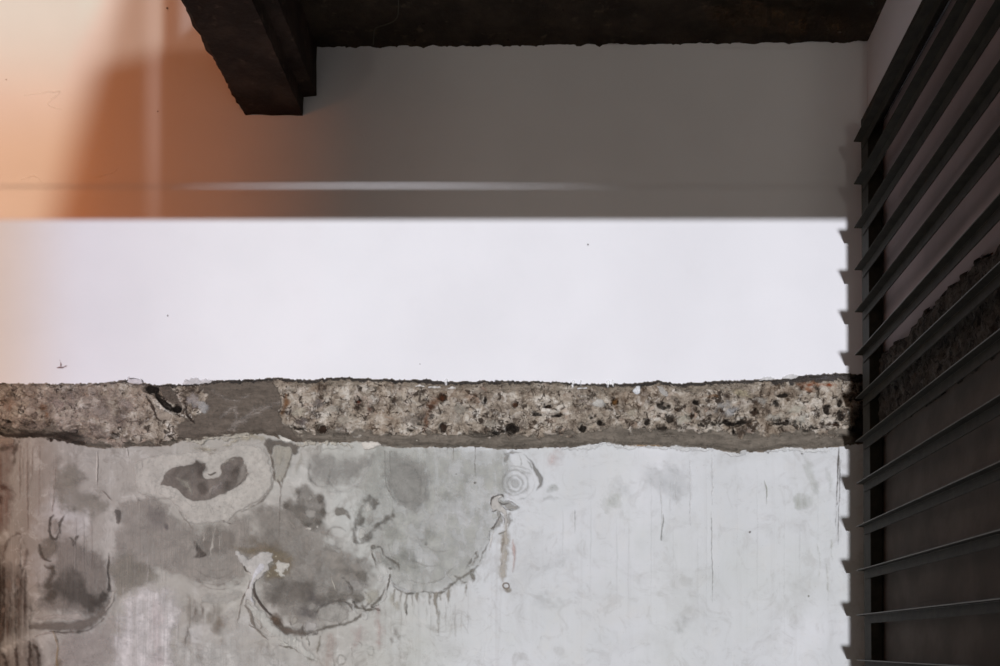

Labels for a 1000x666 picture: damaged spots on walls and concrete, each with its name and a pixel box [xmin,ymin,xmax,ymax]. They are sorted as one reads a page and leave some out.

spalling [0,372,863,456]
damp [264,439,298,485]
damp [0,438,513,660]
damp [0,644,40,666]